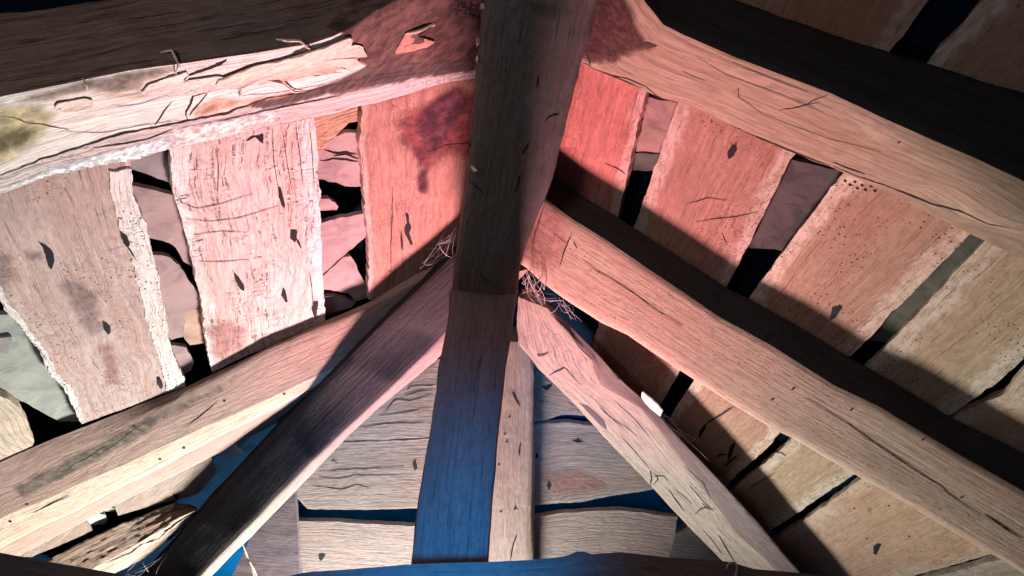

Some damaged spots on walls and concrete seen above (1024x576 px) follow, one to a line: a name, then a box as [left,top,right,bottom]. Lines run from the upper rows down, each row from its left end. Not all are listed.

crack [1,60,359,235]
water stain [0,0,482,193]